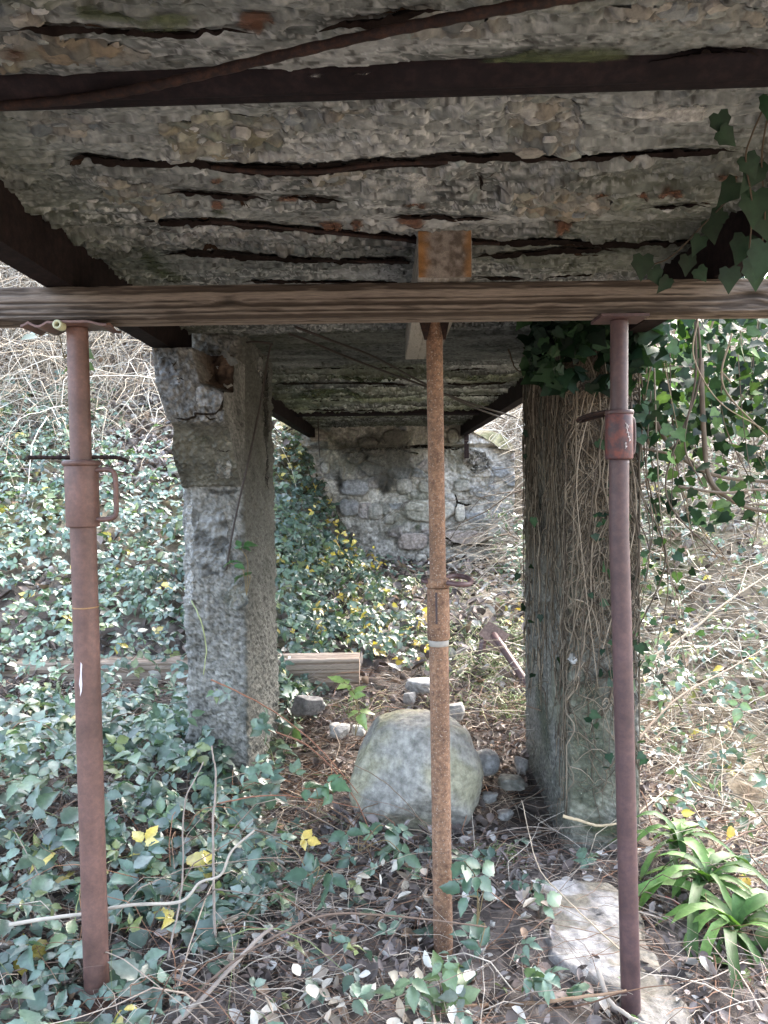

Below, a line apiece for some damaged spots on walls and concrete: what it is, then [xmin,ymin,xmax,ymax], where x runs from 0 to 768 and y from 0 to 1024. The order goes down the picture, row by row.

corrosion [240,12,272,35]
spalling [158,108,374,165]
spalling [303,171,366,188]
spalling [73,176,190,222]
spalling [513,188,613,223]
spalling [196,351,238,408]
crack [176,391,224,421]